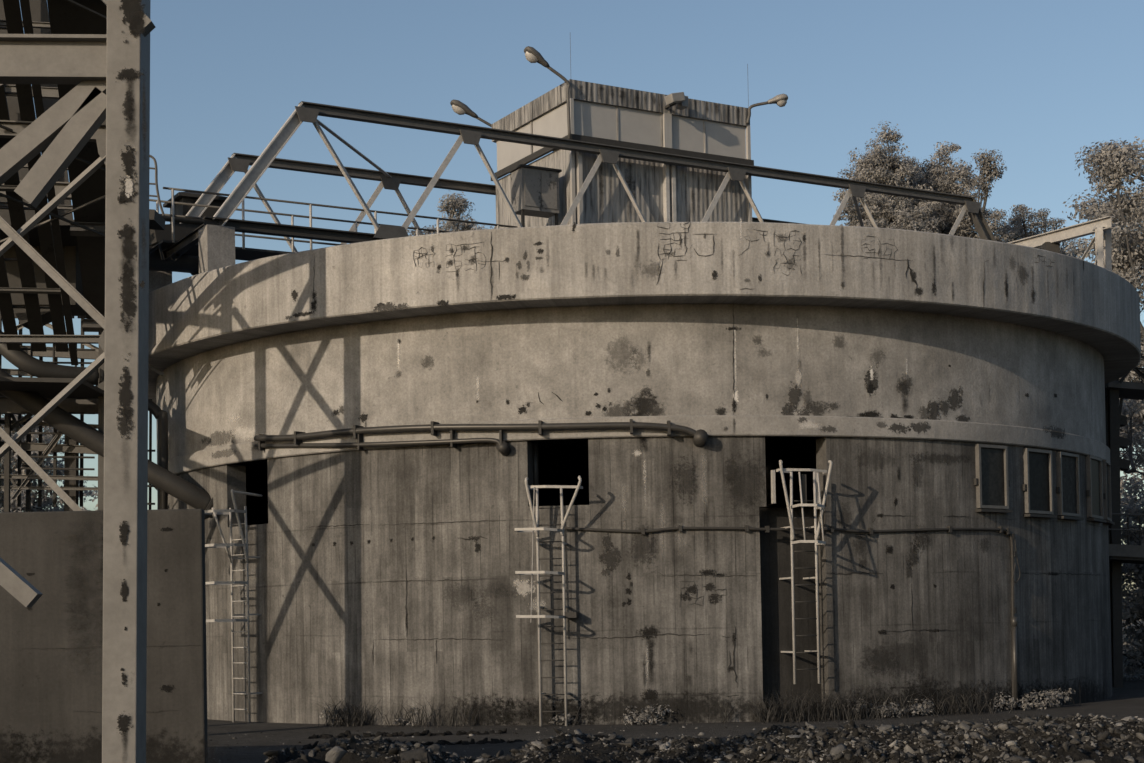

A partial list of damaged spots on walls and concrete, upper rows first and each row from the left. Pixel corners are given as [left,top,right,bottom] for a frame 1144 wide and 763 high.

rust [119,0,147,43]
rust [116,66,146,158]
rust [117,218,146,333]
rust [116,354,134,439]
water stain [805,401,838,416]
water stain [859,359,914,419]